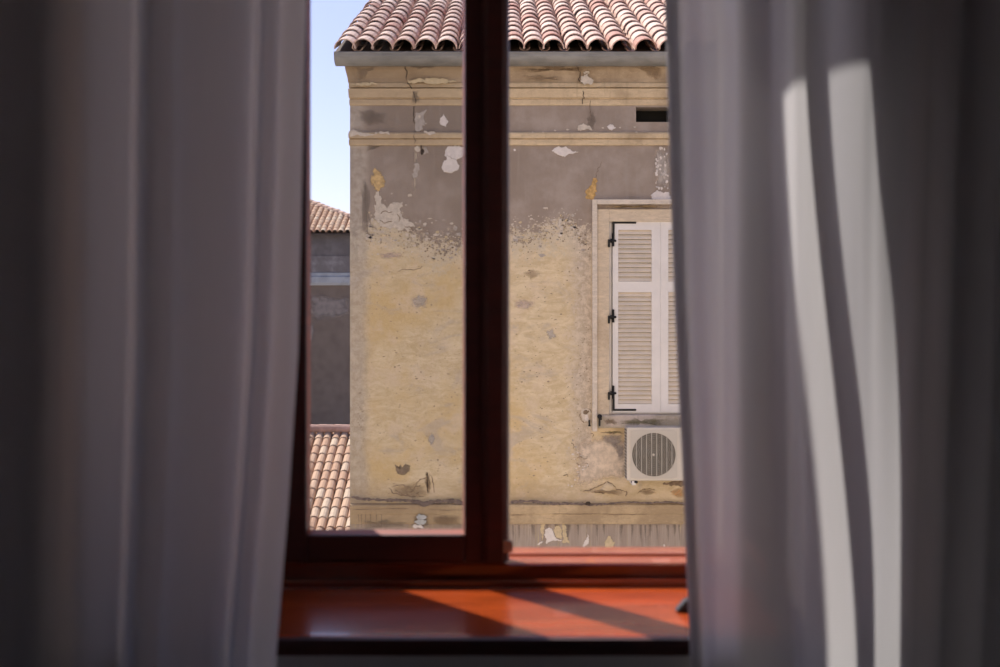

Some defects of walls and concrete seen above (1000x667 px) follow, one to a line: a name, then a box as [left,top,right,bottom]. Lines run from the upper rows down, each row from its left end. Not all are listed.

flaking render [580,71,594,85]
crack [404,66,422,148]
flaking render [414,109,448,135]
peeling [552,146,576,157]
peeling [651,147,671,199]
peeling [366,145,463,263]
flaking render [412,514,427,529]
peeling [537,524,570,545]